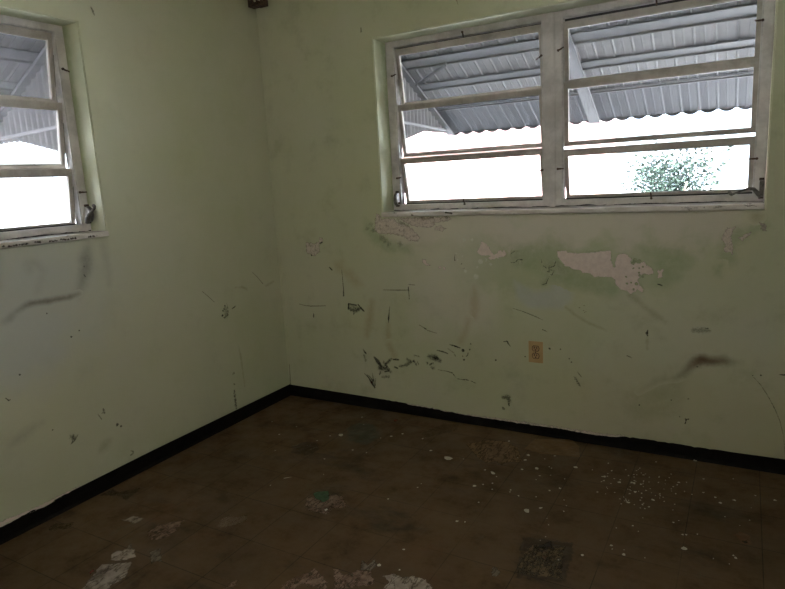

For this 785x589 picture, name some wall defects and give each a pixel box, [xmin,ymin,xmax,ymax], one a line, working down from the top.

peeling [556,249,664,295]
damp [634,351,746,396]